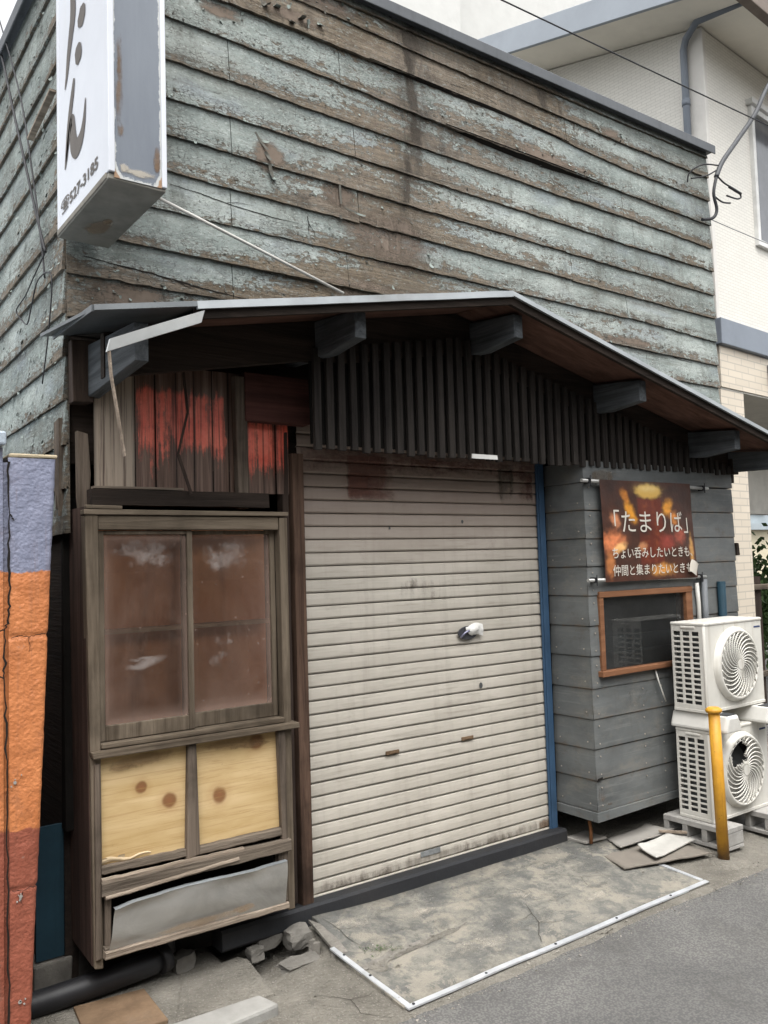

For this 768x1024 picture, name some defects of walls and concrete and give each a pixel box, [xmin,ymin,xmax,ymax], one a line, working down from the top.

peeling [200,0,244,23]
peeling [261,0,368,29]
peeling [254,132,284,180]
peeling [515,144,590,176]
peeling [324,179,434,296]
peeling [76,271,184,304]
rust [346,455,387,498]